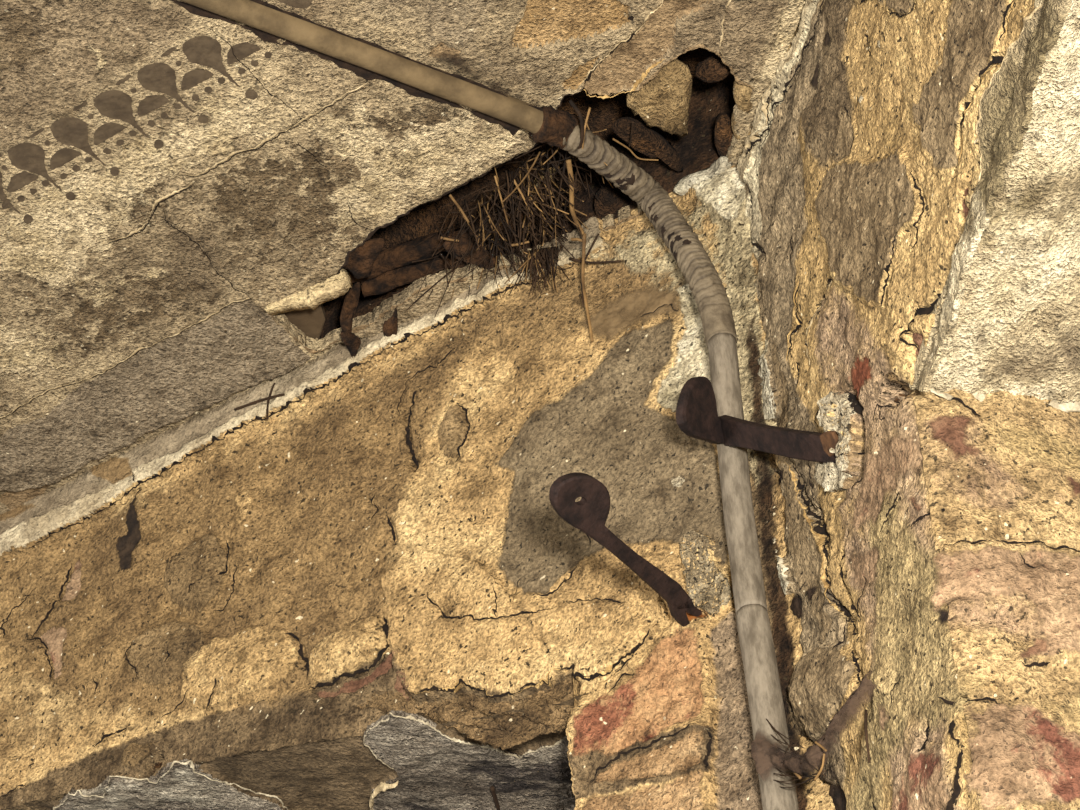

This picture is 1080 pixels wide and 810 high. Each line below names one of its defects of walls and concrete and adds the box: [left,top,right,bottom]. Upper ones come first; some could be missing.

crack [952,0,1014,180]
crack [0,29,367,419]
hole [326,142,571,280]
flaking render [848,356,872,399]
peeling [815,104,915,303]
crack [880,172,925,306]
spalling [885,372,953,406]
crack [899,294,941,351]
crack [284,618,389,689]
peeling [53,550,663,810]
crack [785,458,866,682]
peeling [769,422,923,642]